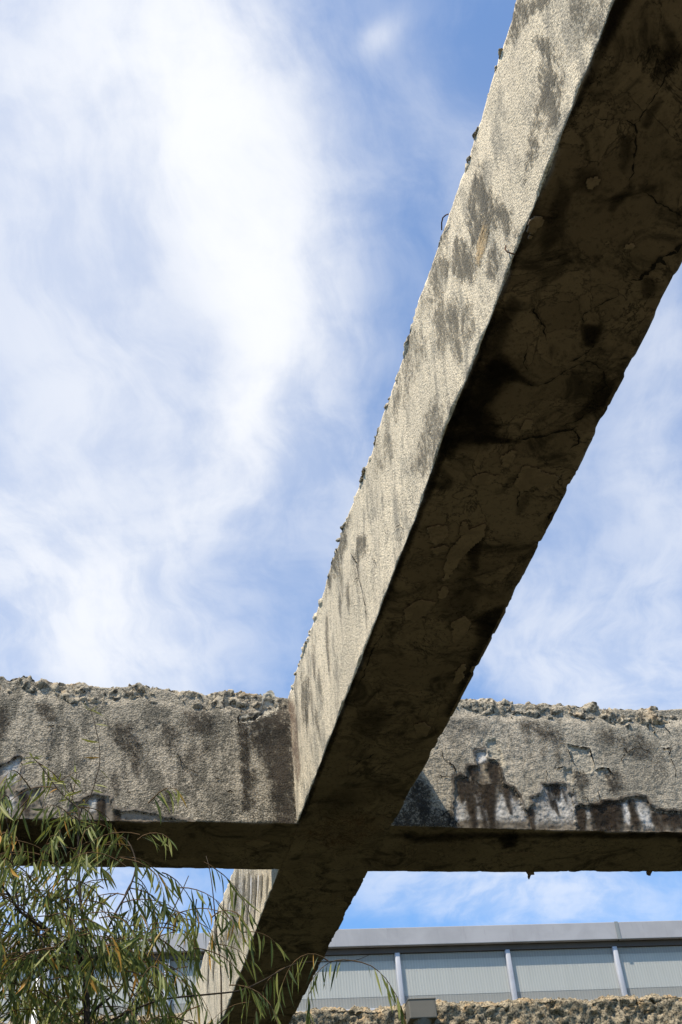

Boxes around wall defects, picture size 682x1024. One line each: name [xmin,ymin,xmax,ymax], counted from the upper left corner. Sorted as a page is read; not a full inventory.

leakage [504,0,549,49]
crack [595,74,681,216]
crack [518,244,682,449]
spalling [353,426,380,501]
leakage [237,160,529,823]
spalling [0,517,348,726]
leakage [107,724,142,777]
spalling [63,792,196,822]
leakage [391,780,681,849]
spalling [450,736,682,832]
spalling [459,698,680,732]
leakage [572,771,589,791]